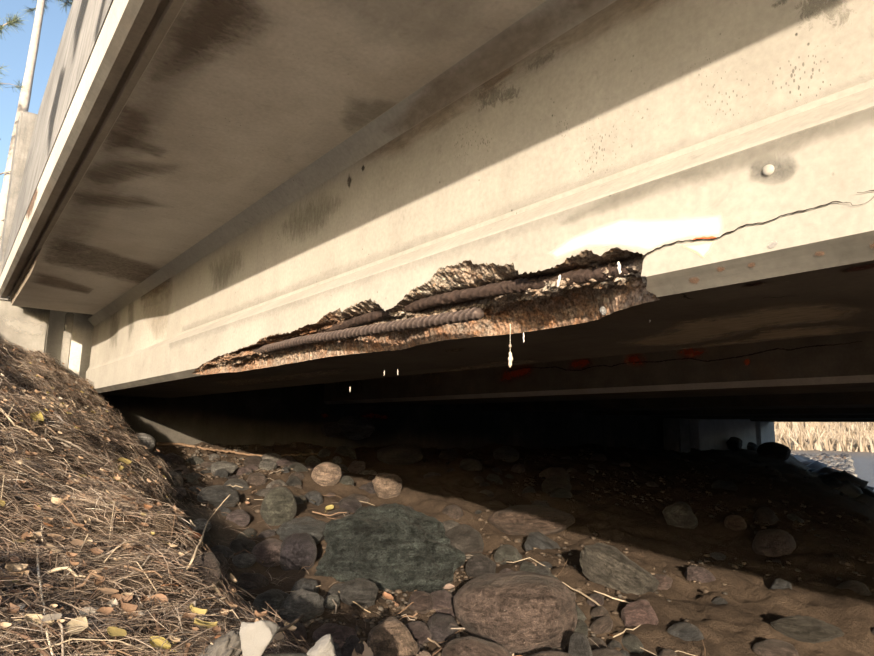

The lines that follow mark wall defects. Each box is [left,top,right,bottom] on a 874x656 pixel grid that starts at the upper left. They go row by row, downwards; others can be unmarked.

damp [48,71,64,152]
damp [755,163,792,177]
crack [642,190,874,259]
spalling [192,247,661,375]
damp [631,305,849,346]